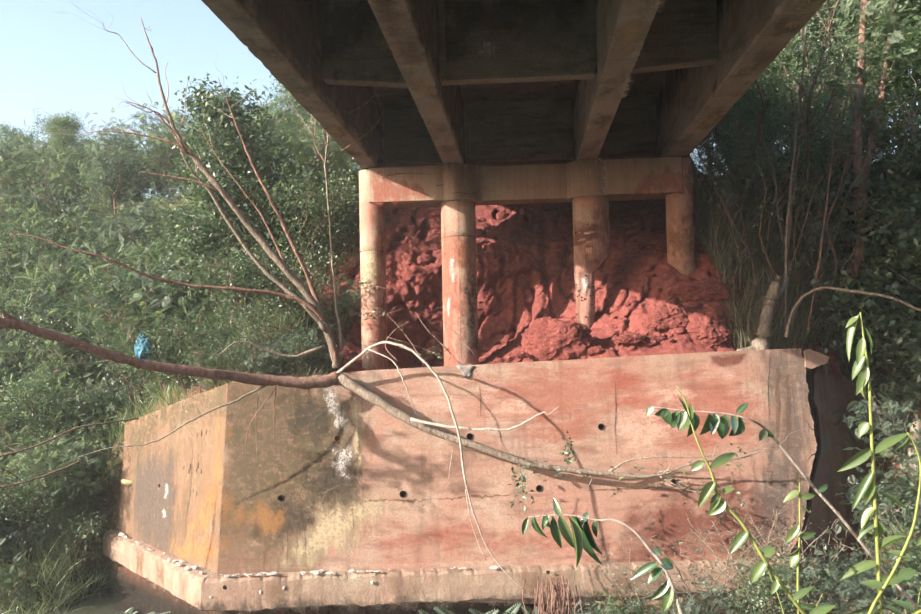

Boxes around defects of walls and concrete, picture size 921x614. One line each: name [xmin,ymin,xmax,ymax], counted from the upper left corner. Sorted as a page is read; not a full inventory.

leakage [130,386,378,565]
crack [363,494,509,503]
crack [587,483,704,491]
crack [804,370,818,518]